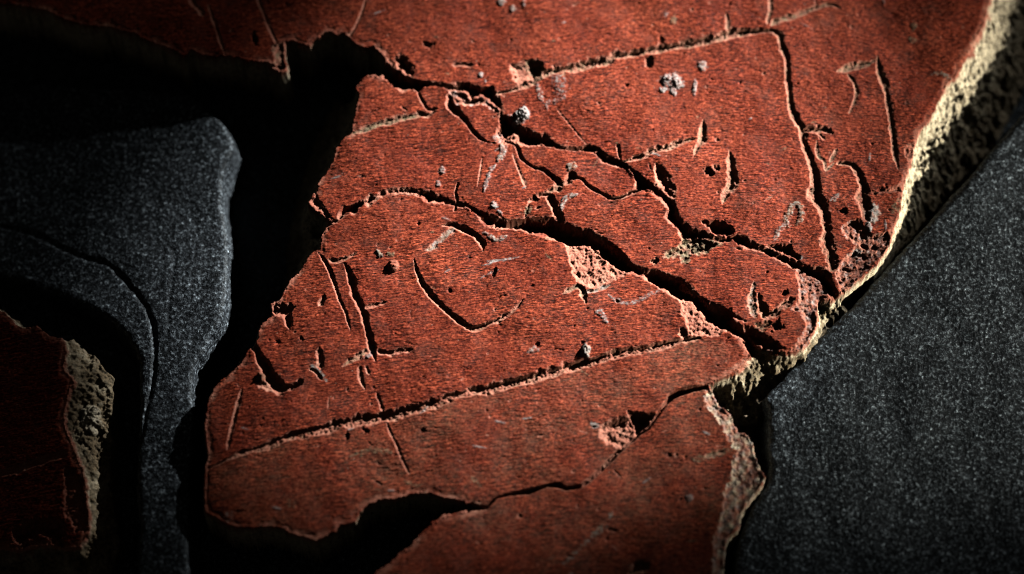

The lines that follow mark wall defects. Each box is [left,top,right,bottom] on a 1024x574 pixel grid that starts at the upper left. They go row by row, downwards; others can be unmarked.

spalling [0,1,416,316]
crack [309,59,841,359]
spalling [562,243,627,304]
spalling [693,119,709,157]
spalling [702,0,1024,574]
spalling [203,326,468,574]
crack [465,383,711,514]